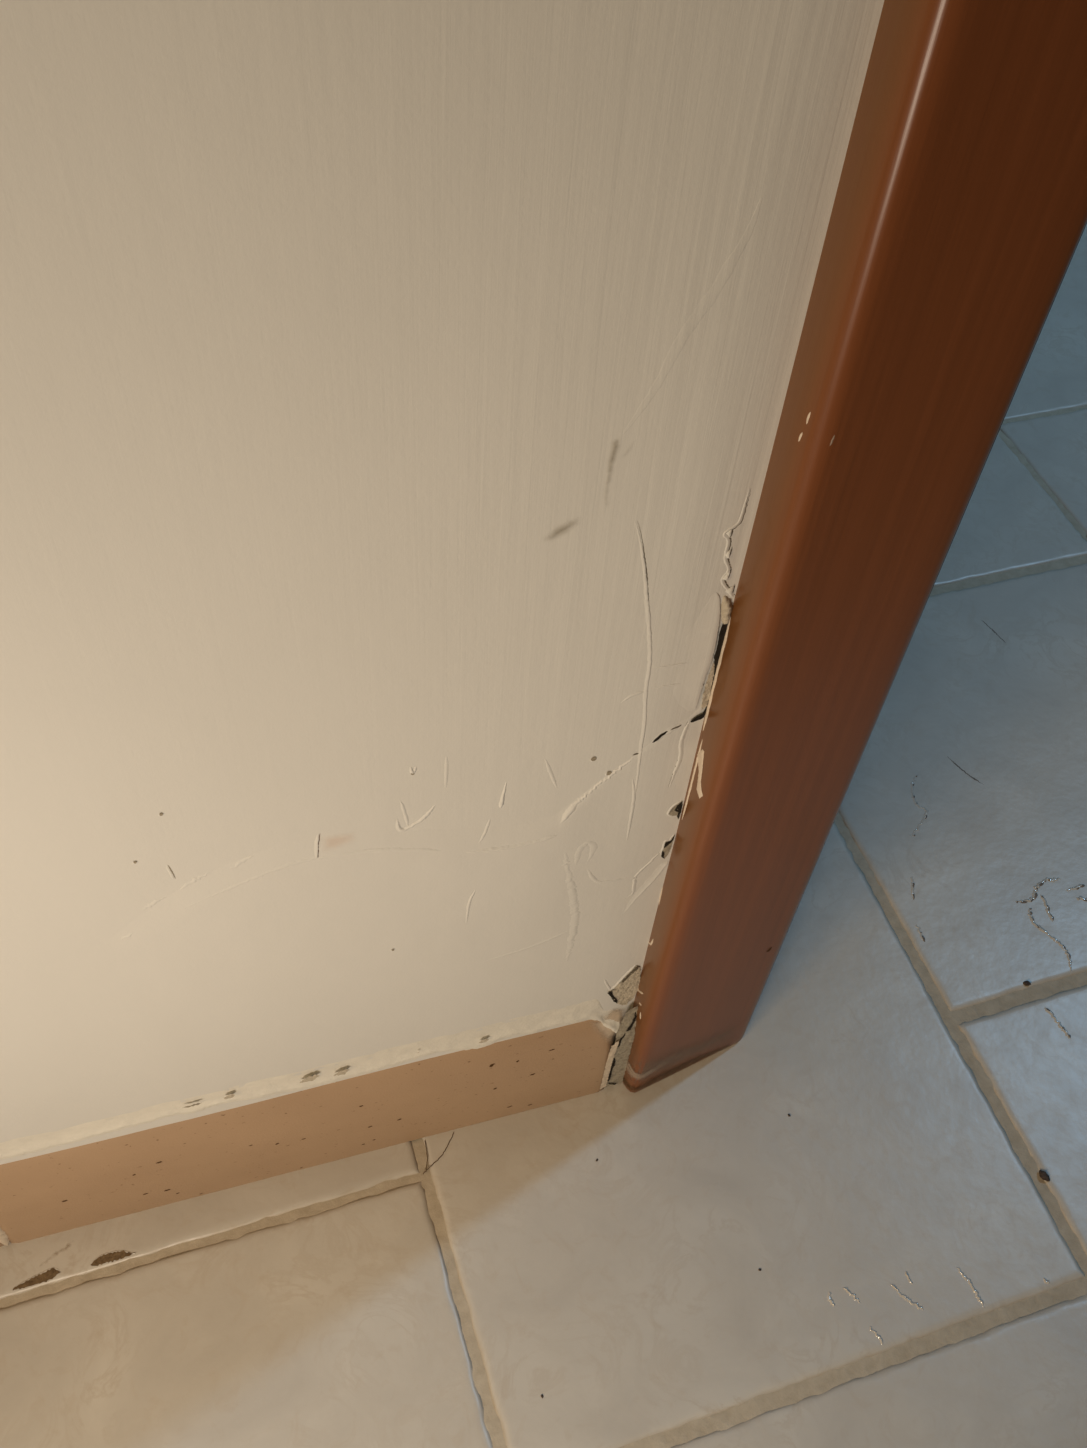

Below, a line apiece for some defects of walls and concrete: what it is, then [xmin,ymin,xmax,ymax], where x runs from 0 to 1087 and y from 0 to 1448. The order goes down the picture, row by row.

crack [560,521,690,823]
crack [166,865,176,879]
spalling [624,800,683,913]
peeling [0,965,643,1160]